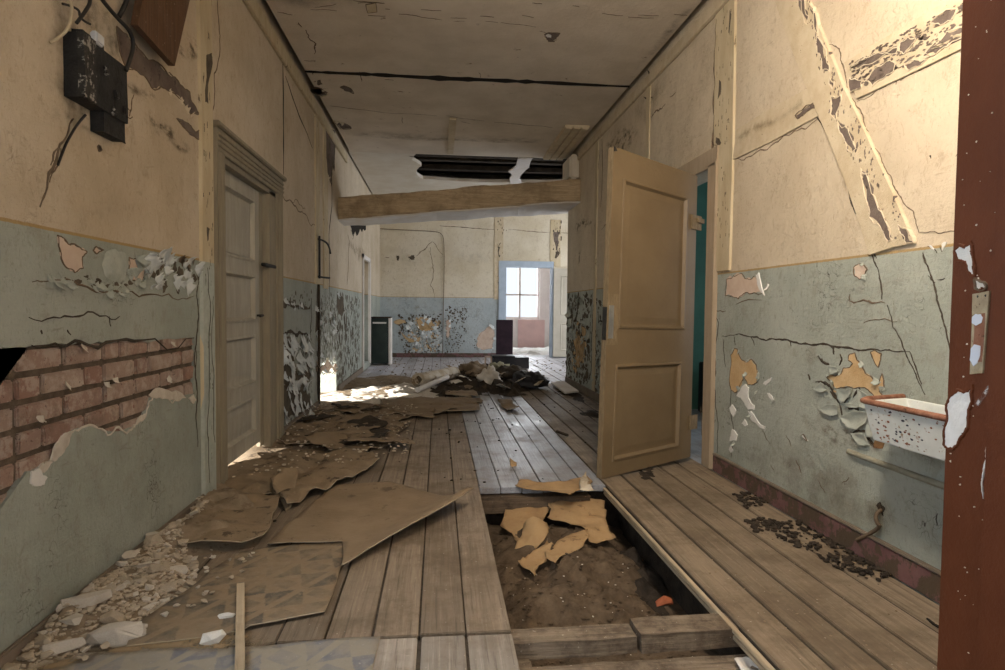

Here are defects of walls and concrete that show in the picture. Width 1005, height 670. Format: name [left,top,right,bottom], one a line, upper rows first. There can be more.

peeling [116,26,213,140]
peeling [799,0,963,244]
peeling [33,223,213,300]
crack [829,44,954,347]
spalling [0,338,196,505]
crack [29,268,215,482]
peeling [283,290,360,425]
peeling [394,306,496,353]
peeling [565,292,603,392]
peeling [729,348,775,452]
crack [700,254,925,456]
peeling [942,376,974,462]